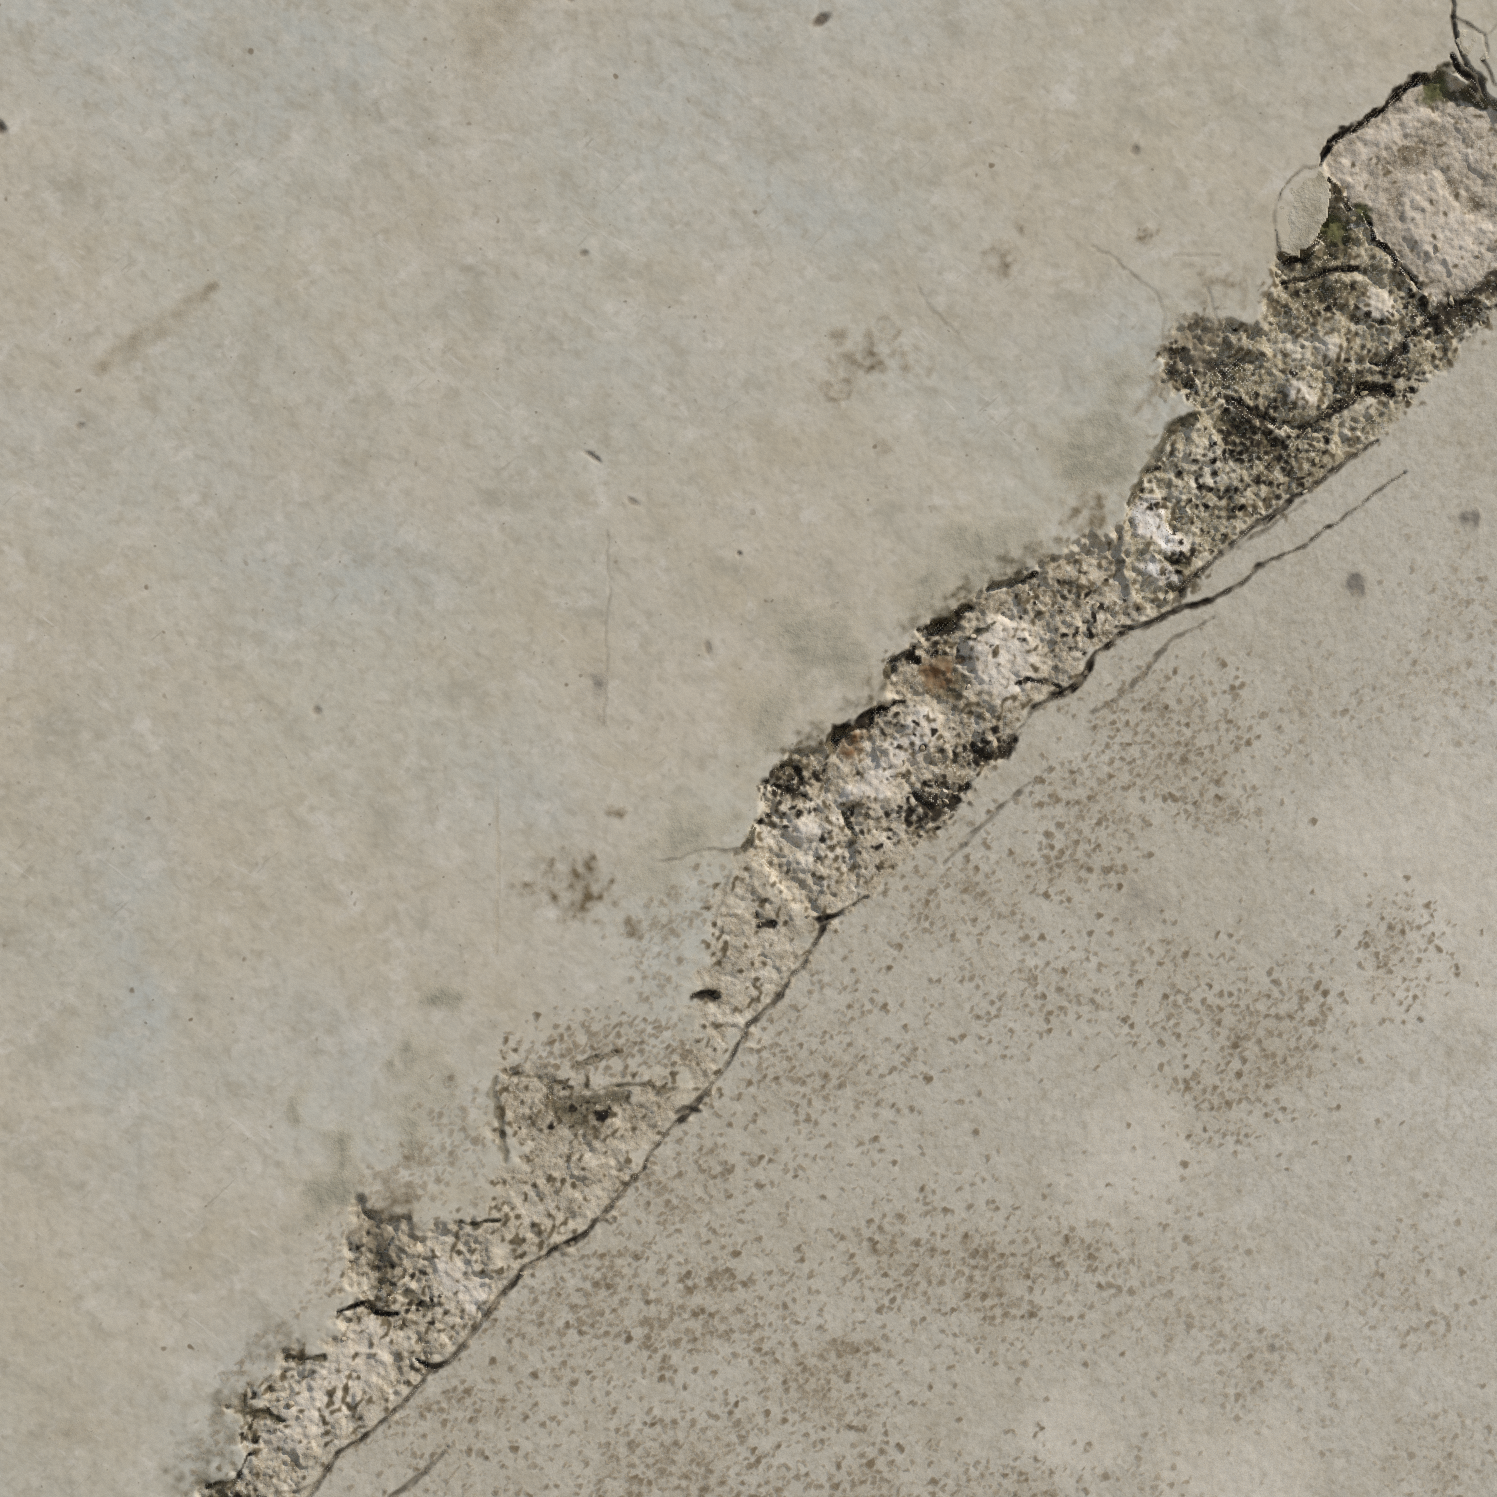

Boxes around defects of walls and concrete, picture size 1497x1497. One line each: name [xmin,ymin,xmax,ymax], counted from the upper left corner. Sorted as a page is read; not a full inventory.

crack [1450,0,1494,99]
spalling [674,30,1497,1110]
crack [1029,440,1387,714]
spalling [197,1063,683,1497]
crack [318,895,869,1485]
spalling [575,1051,619,1069]
crack [390,1466,431,1497]